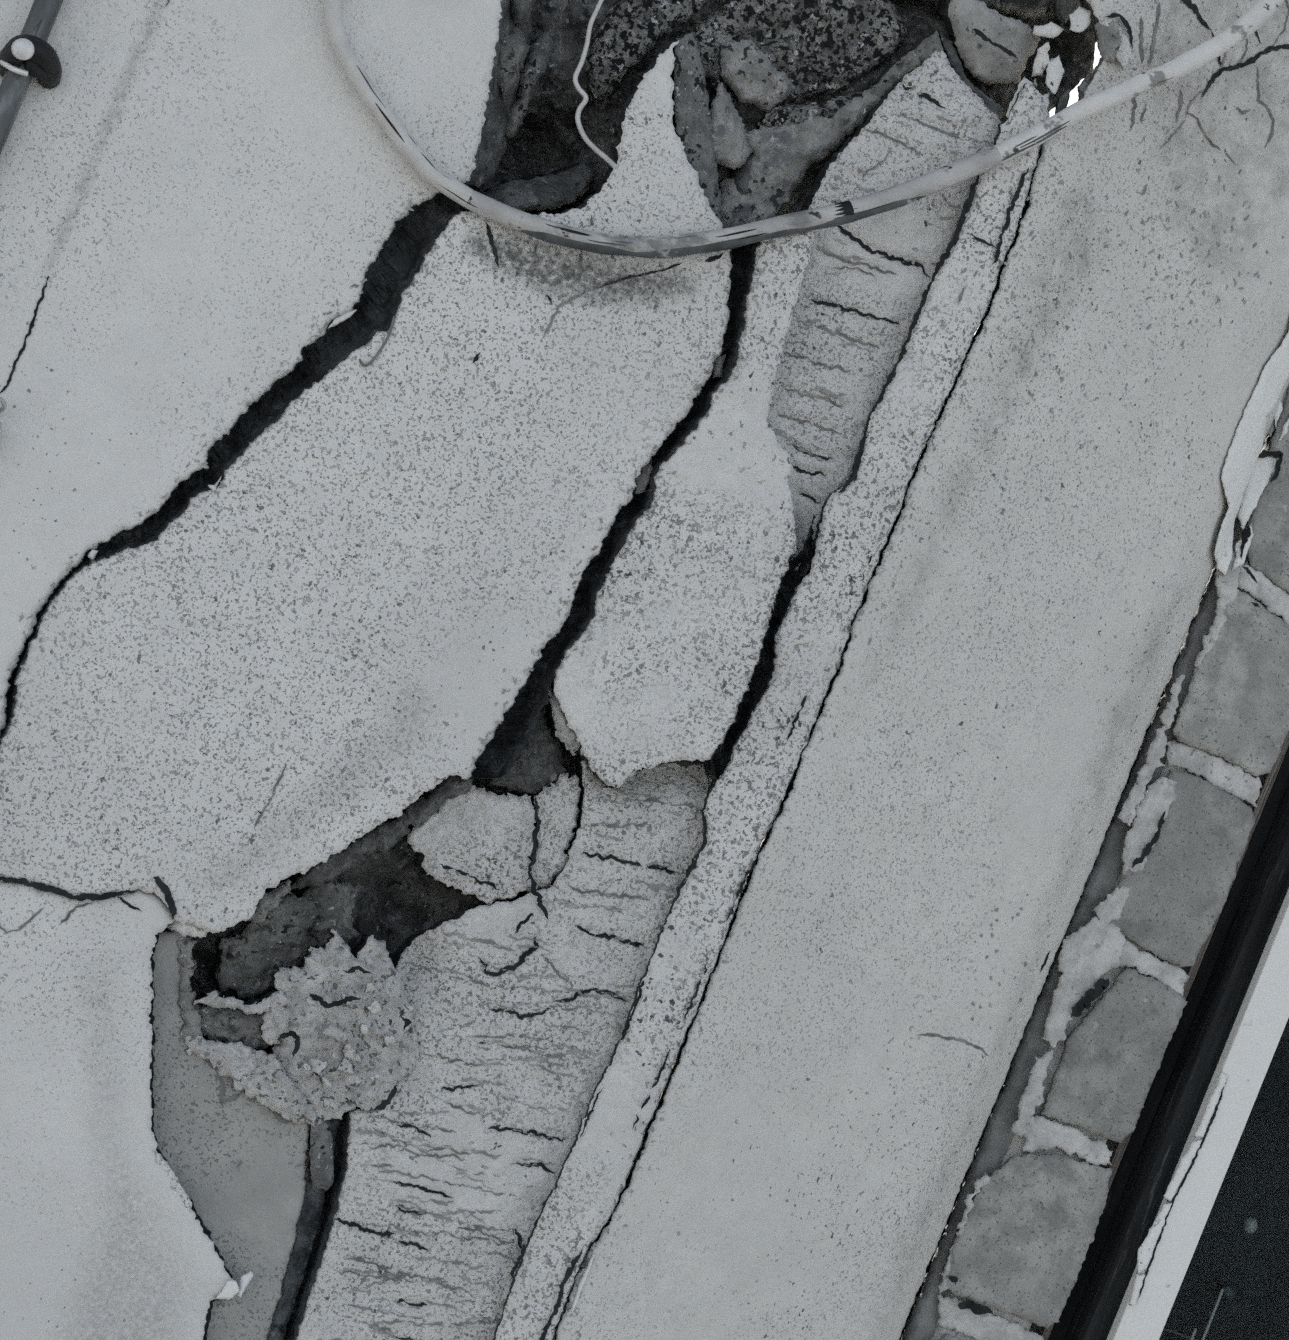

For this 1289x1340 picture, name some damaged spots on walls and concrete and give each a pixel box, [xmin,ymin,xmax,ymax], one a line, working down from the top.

spalling [463,0,1133,229]
crack [1132,0,1289,165]
crack [0,192,499,794]
crack [469,215,765,779]
flaking render [767,174,981,571]
peeling [1214,330,1289,584]
crack [539,145,1059,1340]
crack [0,876,177,933]
flaking render [148,684,715,1340]
spalling [1071,978,1110,1017]
crack [510,1242,526,1279]
peeling [1129,1071,1227,1305]